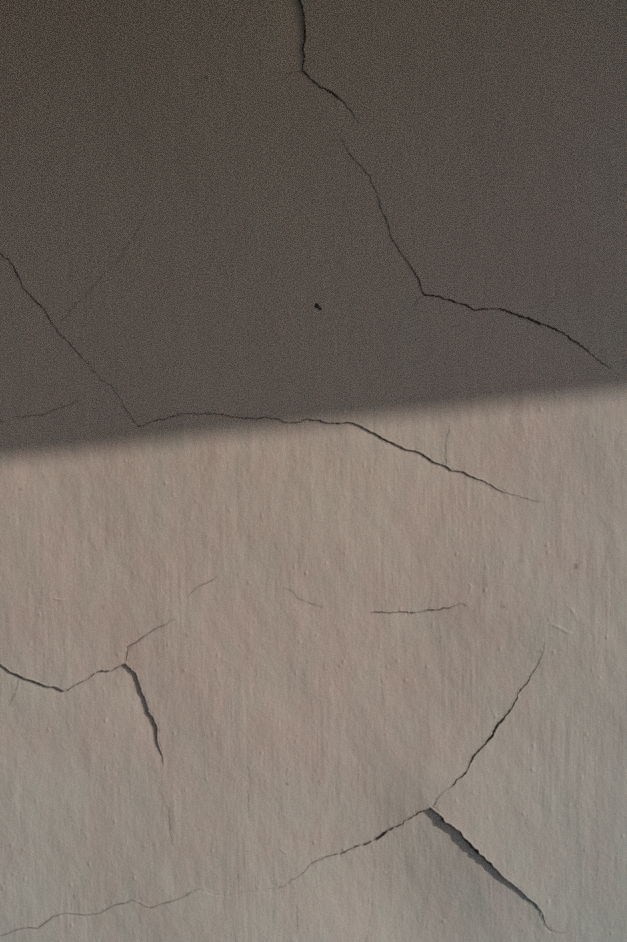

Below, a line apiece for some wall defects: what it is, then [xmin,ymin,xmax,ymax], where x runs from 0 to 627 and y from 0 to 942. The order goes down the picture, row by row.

crack [297,0,615,372]
crack [0,250,522,498]
crack [0,618,176,768]
crack [286,641,567,934]